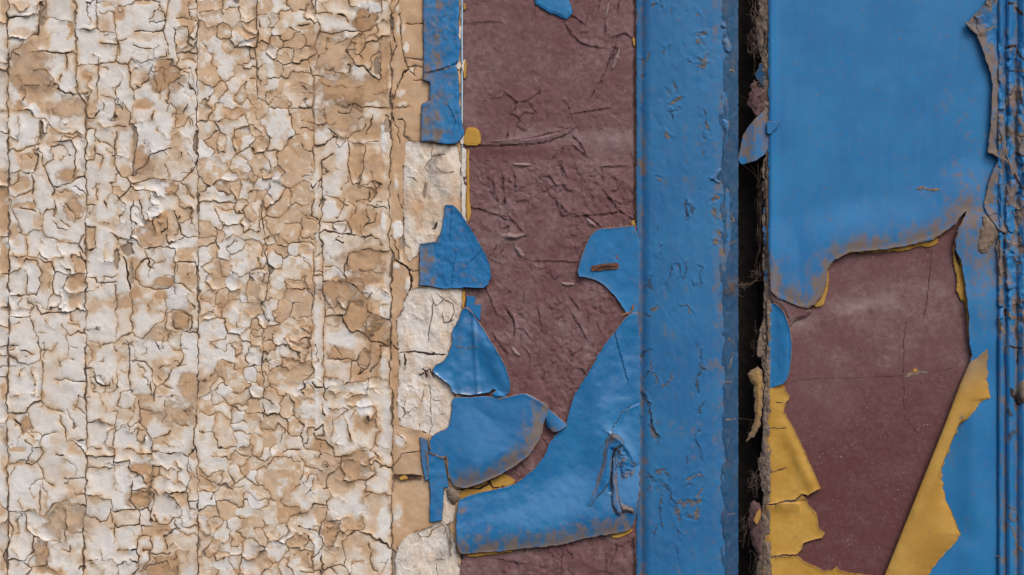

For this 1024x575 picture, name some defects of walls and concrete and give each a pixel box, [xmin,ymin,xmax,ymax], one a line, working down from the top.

crack [252,5,260,96]
peeling [965,0,1024,286]
crack [0,0,233,575]
crack [260,205,271,418]
peeling [0,0,674,575]
peeling [746,303,792,442]
peeling [885,349,991,575]
peeling [998,309,1024,335]
peeling [1004,505,1023,553]